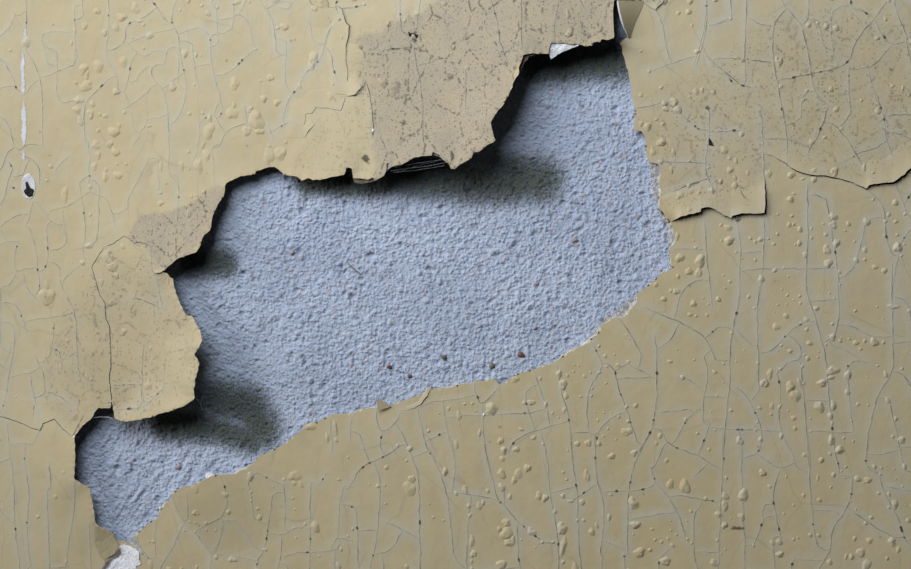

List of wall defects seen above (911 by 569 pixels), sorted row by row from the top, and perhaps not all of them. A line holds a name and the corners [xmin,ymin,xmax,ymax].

crack [369,0,467,152]
crack [490,0,523,62]
peeling [74,0,767,569]
crack [253,182,911,569]
crack [0,447,76,569]
crack [146,475,227,569]